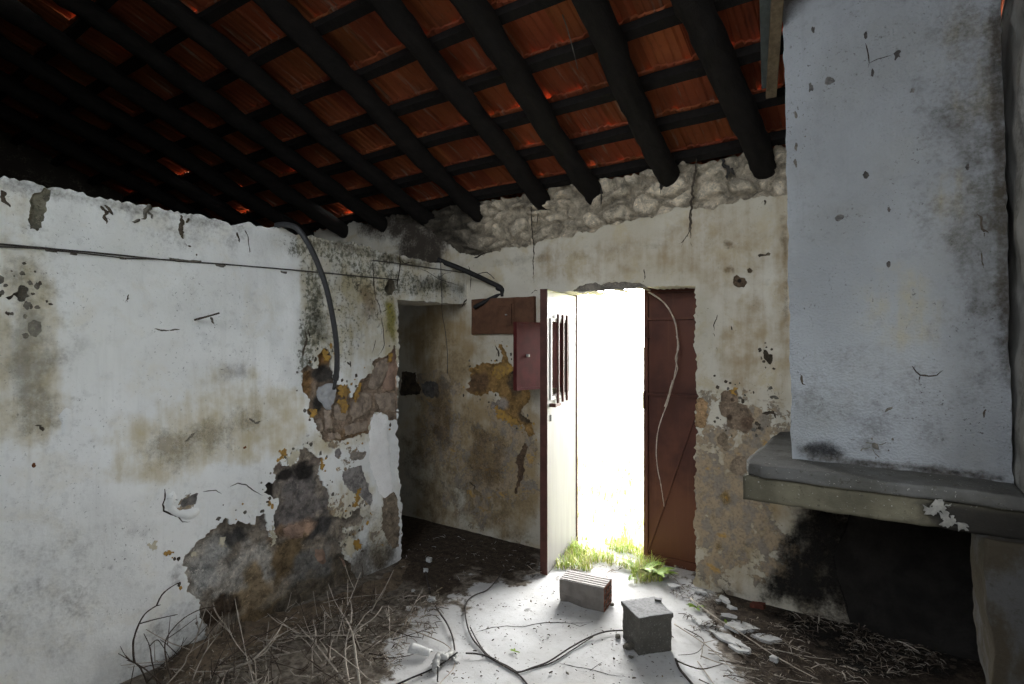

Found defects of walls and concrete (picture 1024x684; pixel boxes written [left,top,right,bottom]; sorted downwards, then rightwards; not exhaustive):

flaking render [395,145,787,256]
peeling [463,344,537,494]
spalling [695,375,768,451]
spalling [147,343,439,637]
peeling [922,499,969,532]